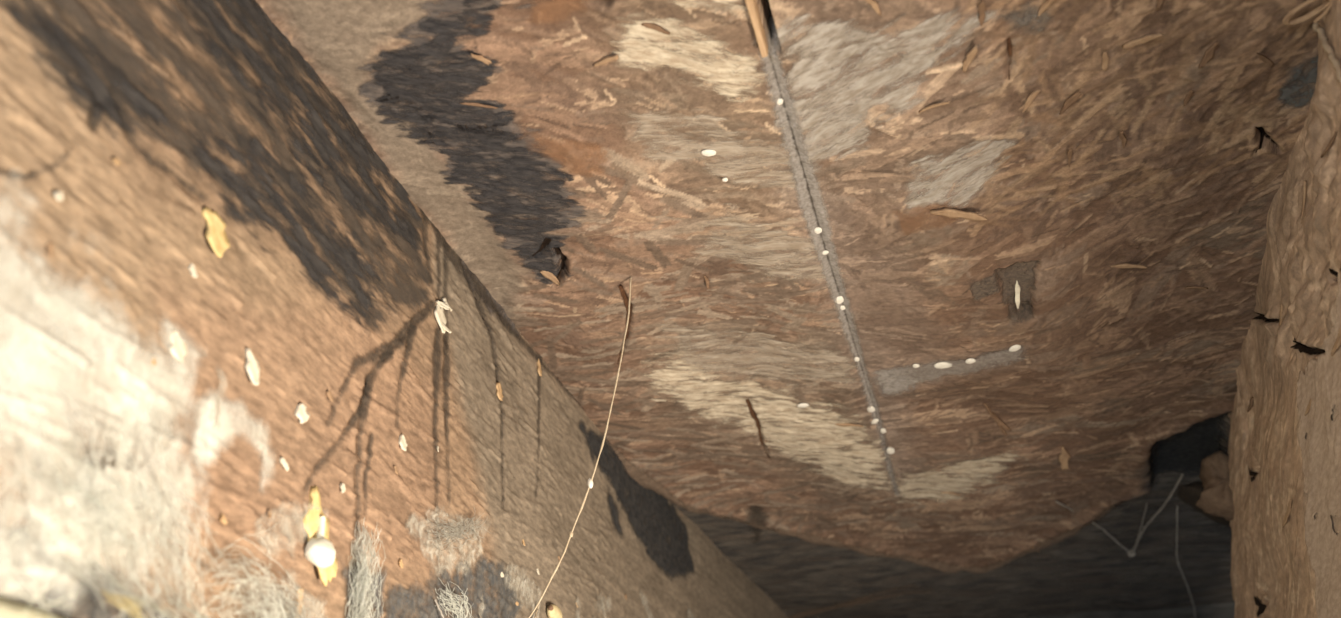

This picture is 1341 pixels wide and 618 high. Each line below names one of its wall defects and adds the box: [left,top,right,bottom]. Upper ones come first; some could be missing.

damp [2,0,586,532]
damp [694,217,829,279]
damp [614,0,1051,188]
damp [906,140,1015,215]
damp [343,320,539,618]
damp [643,324,1028,504]
damp [579,422,1235,618]